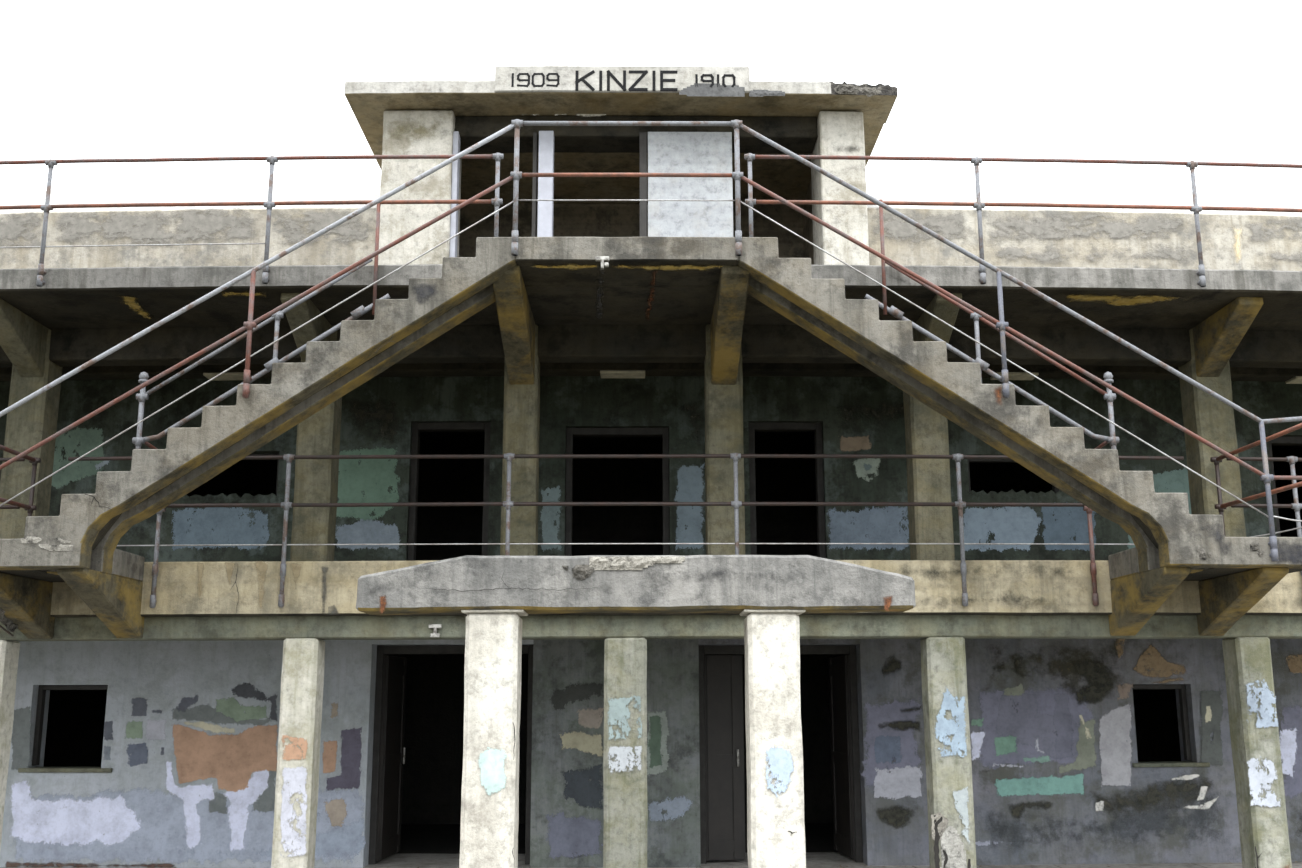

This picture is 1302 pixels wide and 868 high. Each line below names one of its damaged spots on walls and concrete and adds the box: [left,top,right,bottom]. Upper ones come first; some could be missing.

spalling [562,557,685,580]
leakage [994,647,1118,704]
spalling [931,812,967,868]